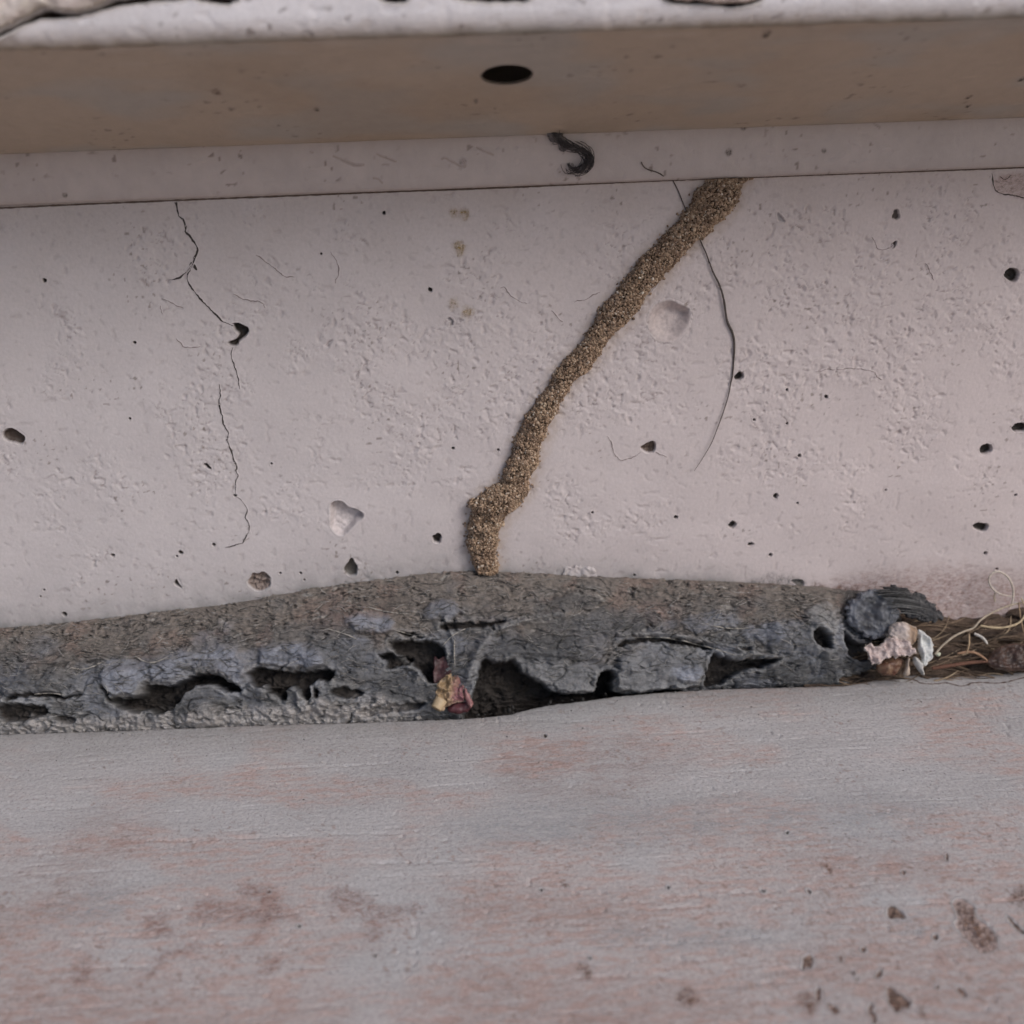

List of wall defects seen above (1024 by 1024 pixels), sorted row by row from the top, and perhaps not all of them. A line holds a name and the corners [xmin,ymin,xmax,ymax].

crack [159,202,266,548]
peeling [917,629,941,666]